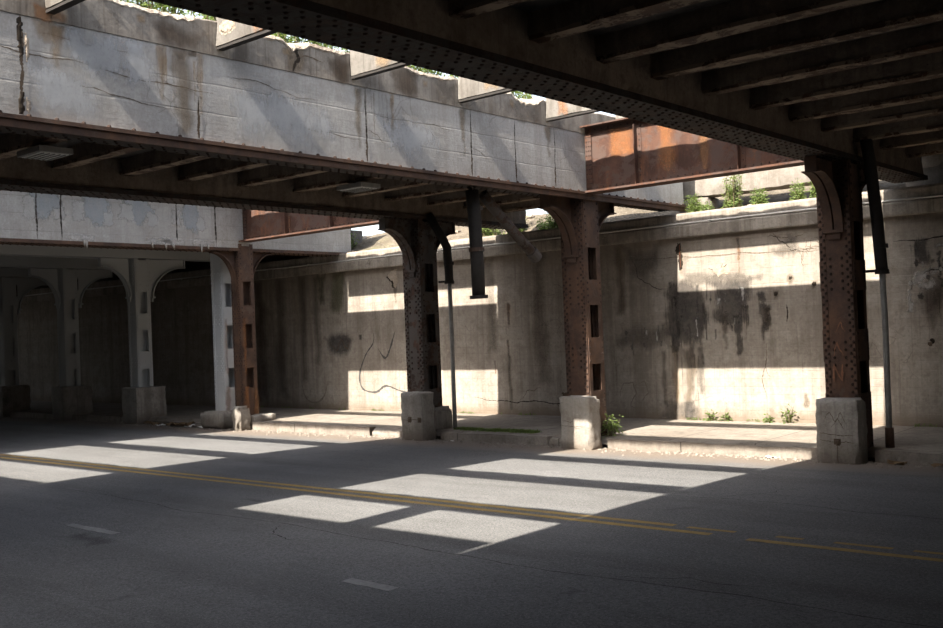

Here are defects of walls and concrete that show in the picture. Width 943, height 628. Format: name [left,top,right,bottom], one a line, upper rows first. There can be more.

crack [1,33,214,139]
crack [232,47,321,101]
crack [271,90,483,176]
crack [511,120,519,180]
peeling [23,193,158,227]
peeling [171,205,206,233]
water stain [616,248,771,357]
water stain [908,239,943,317]